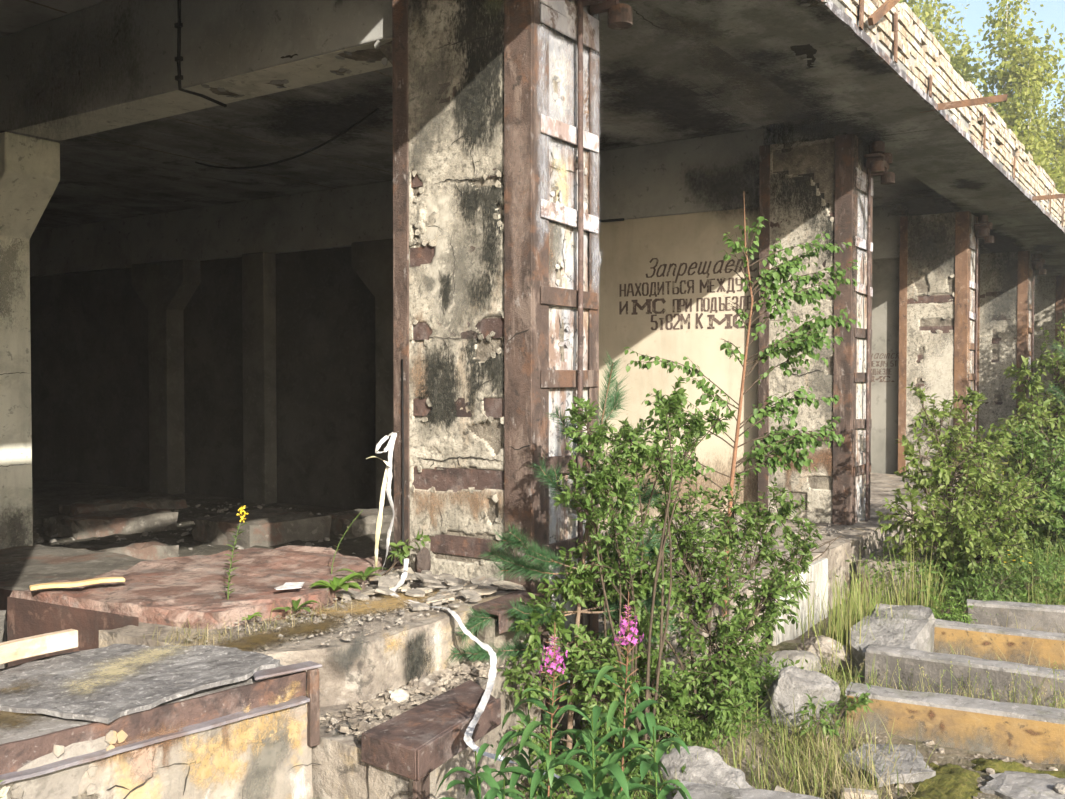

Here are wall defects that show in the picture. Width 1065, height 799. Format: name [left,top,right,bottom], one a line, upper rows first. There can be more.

leakage [413,0,504,170]
flaking render [409,170,456,332]
leakage [419,169,504,427]
spalling [475,331,504,361]
leakage [385,630,439,682]
spalling [0,729,128,799]
crack [107,738,253,799]